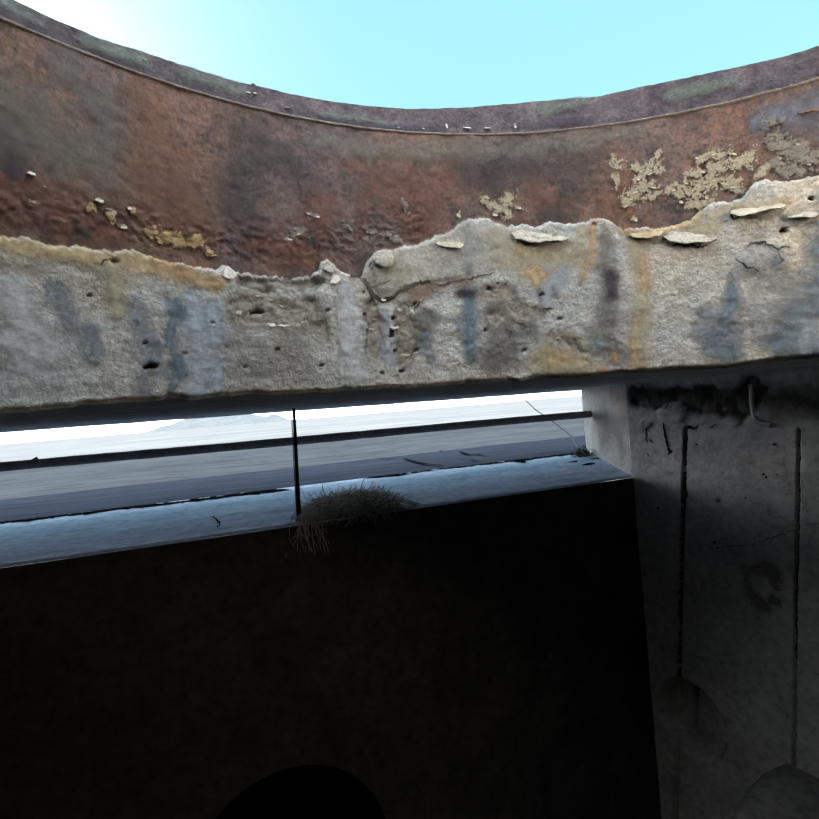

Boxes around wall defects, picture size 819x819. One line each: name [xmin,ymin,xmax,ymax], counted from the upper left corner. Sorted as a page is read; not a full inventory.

peeling [86,197,127,229]
rust [0,163,225,319]
peeling [143,224,217,256]
peeling [478,189,570,247]
peeling [605,110,819,248]
water stain [0,279,55,374]
water stain [129,289,224,401]
crack [350,272,494,331]
water stain [456,288,537,372]
water stain [693,271,744,368]
spalling [631,386,761,432]